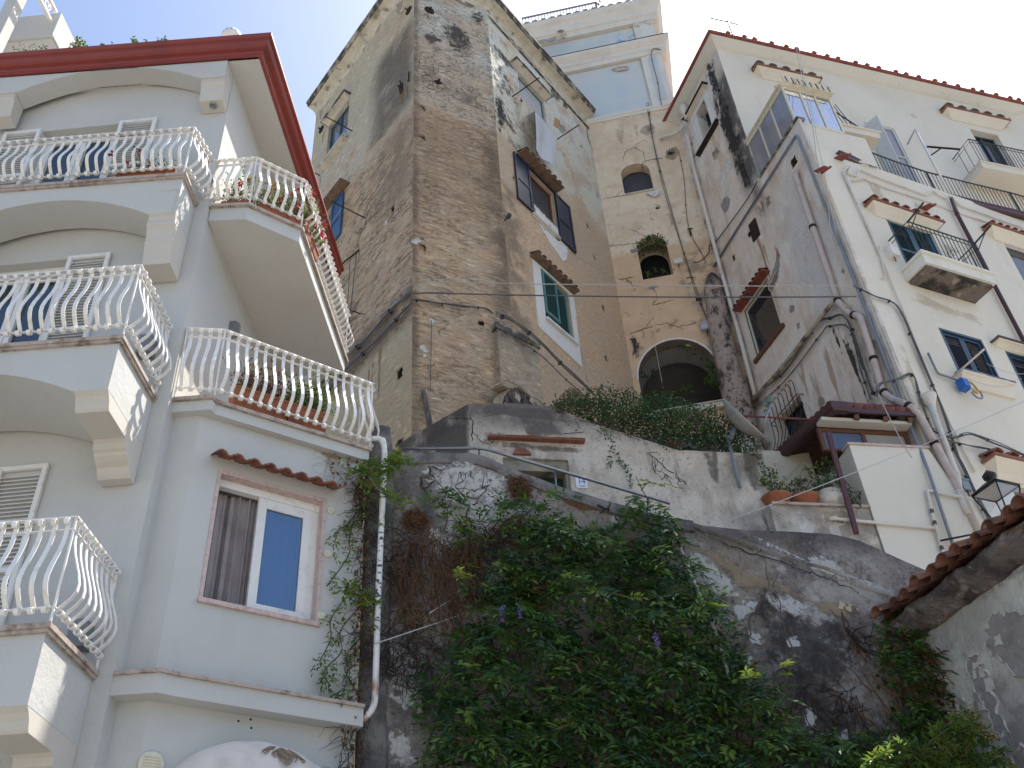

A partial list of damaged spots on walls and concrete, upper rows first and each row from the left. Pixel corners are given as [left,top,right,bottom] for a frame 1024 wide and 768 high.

damp [707,63,750,187]
crack [625,276,700,342]
crack [701,532,874,650]
peeling [954,609,1024,738]